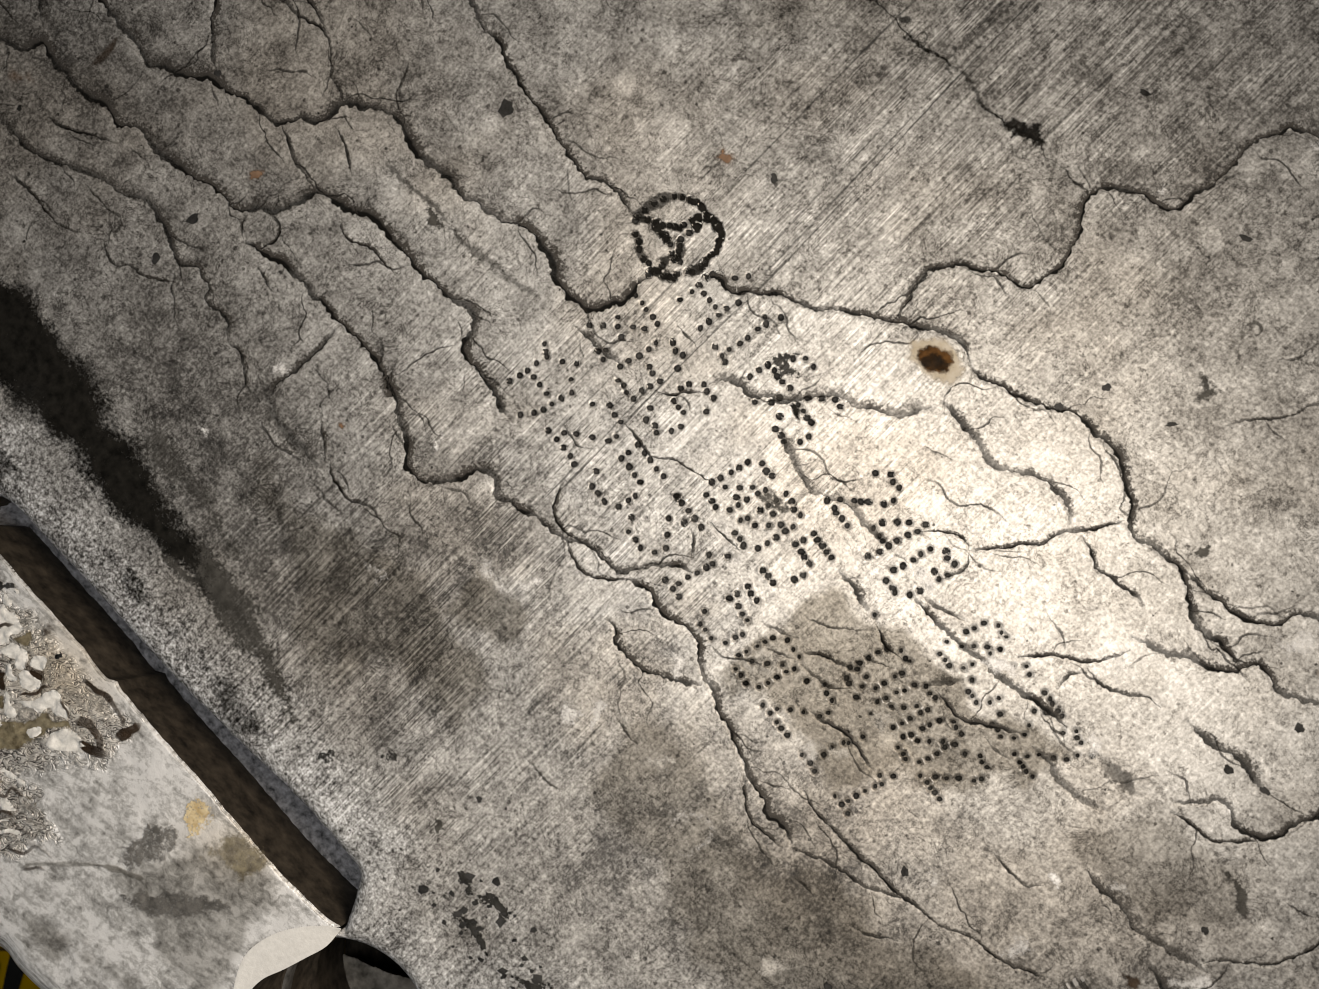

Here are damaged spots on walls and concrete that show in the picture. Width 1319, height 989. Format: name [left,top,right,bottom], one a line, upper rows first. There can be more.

rust [910,338,963,383]
crack [0,0,1041,977]
crack [660,119,1319,781]
peeling [0,588,84,753]
damp [125,570,151,605]
damp [162,542,299,724]
damp [215,681,271,740]
damp [981,656,1016,678]
peeling [0,768,39,870]
crack [1177,728,1319,860]
peeling [418,871,554,989]
crack [1092,878,1319,989]